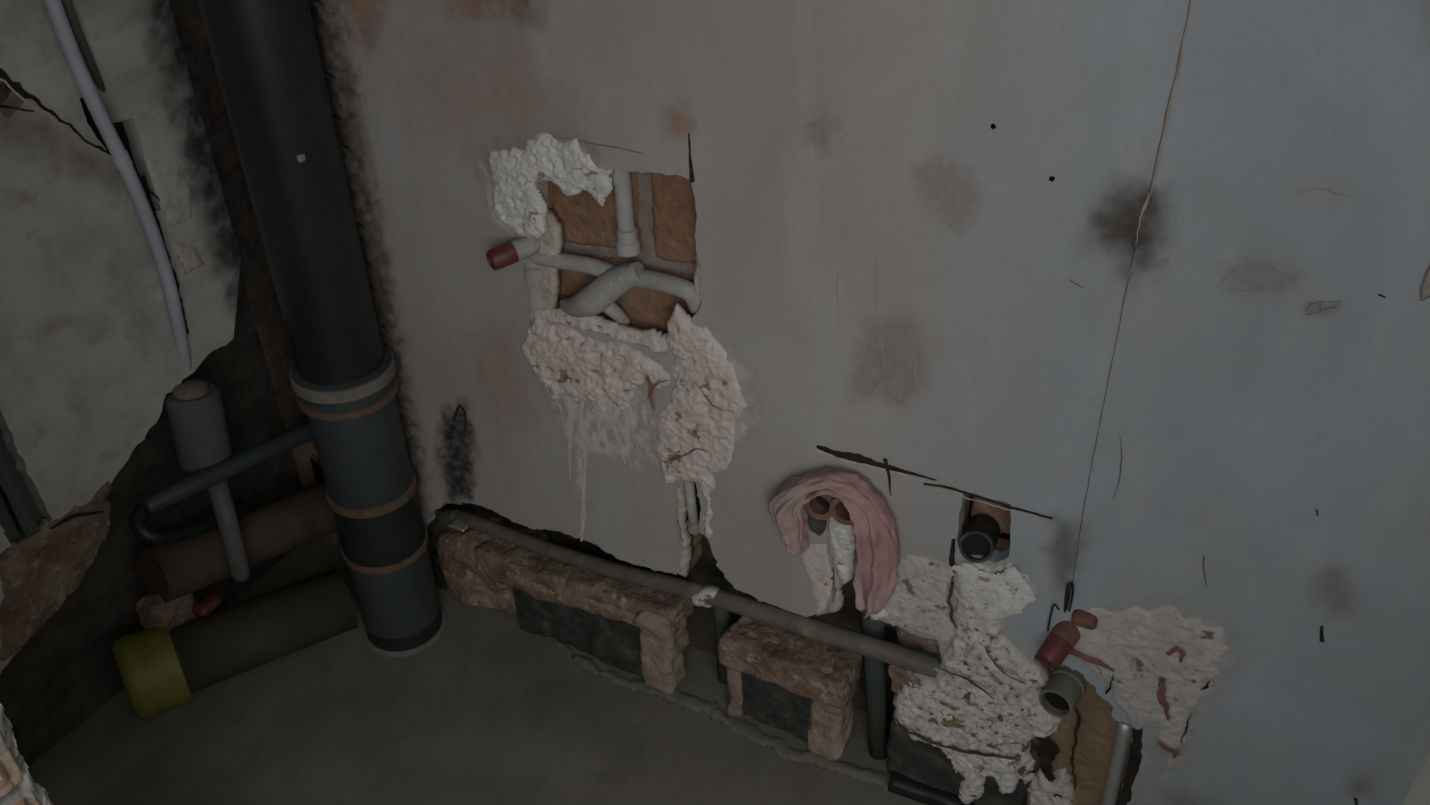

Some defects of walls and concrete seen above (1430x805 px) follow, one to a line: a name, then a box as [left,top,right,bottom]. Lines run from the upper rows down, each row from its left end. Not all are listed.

crack [0,68,110,157]
crack [1066,0,1193,610]
leakage [443,404,472,500]
crack [883,458,891,496]
flaking render [0,481,111,662]
flaking render [816,566,845,616]
flaking render [870,494,1234,805]
flaking render [0,704,55,805]